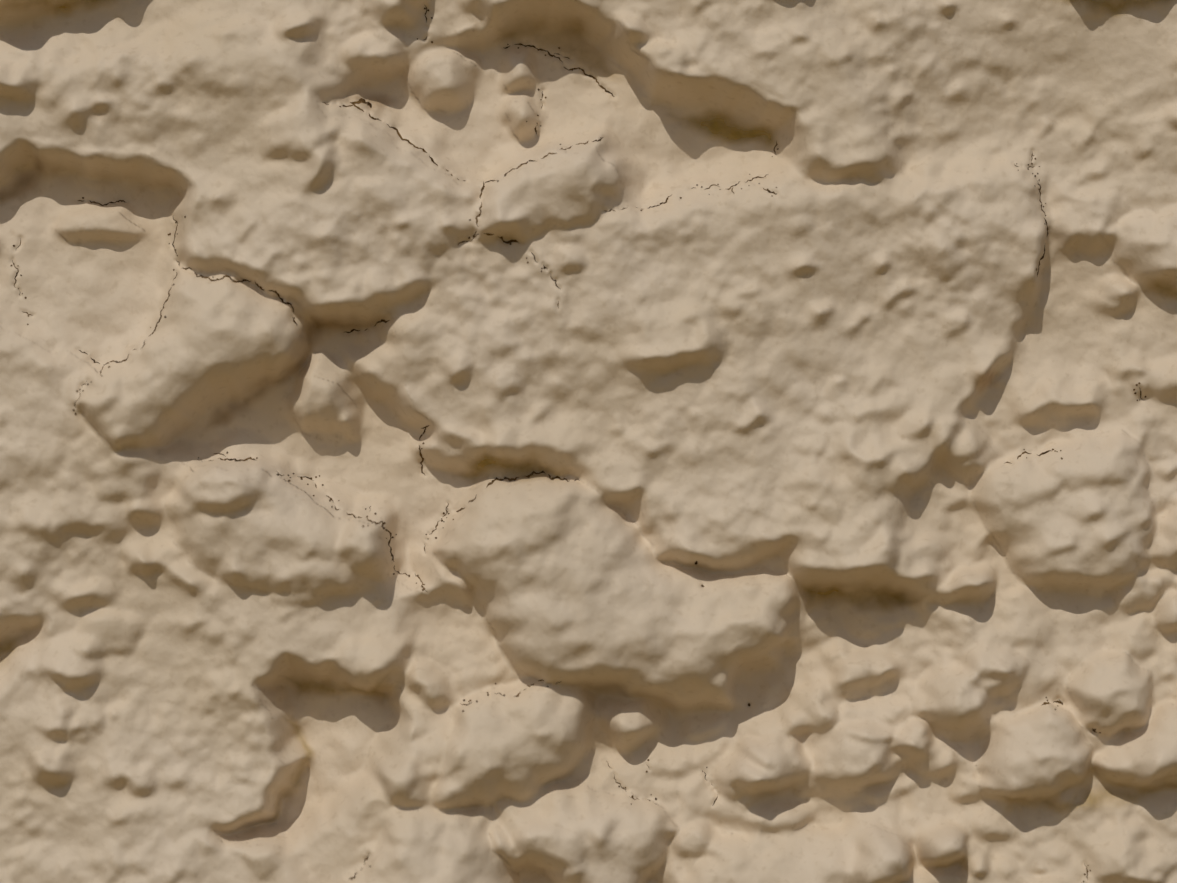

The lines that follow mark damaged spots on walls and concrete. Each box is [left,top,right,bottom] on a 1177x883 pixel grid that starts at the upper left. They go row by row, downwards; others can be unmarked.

crack [505,43,614,97]
crack [77,197,125,206]
crack [322,88,601,309]
crack [606,141,778,212]
crack [1015,153,1049,276]
crack [73,216,297,415]
crack [419,425,430,475]
crack [197,452,580,592]